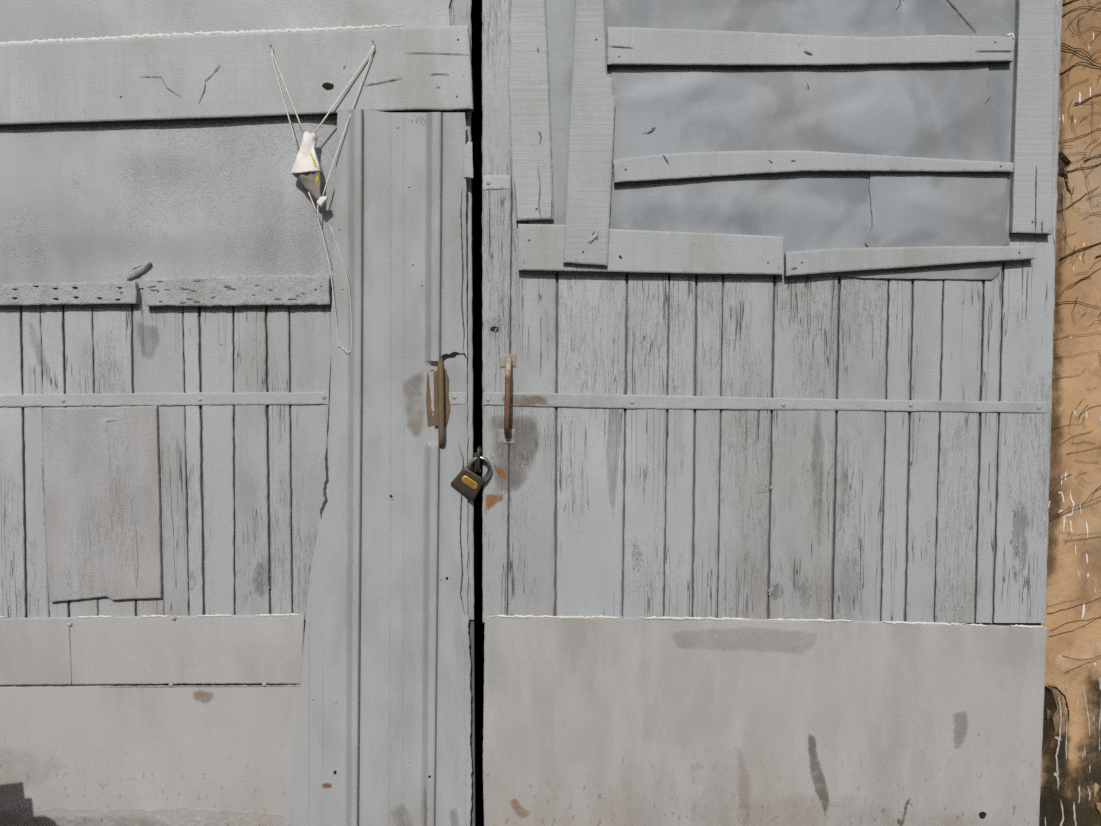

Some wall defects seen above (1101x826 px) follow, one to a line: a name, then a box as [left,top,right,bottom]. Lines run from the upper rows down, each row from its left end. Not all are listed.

leakage [1039,680,1101,826]